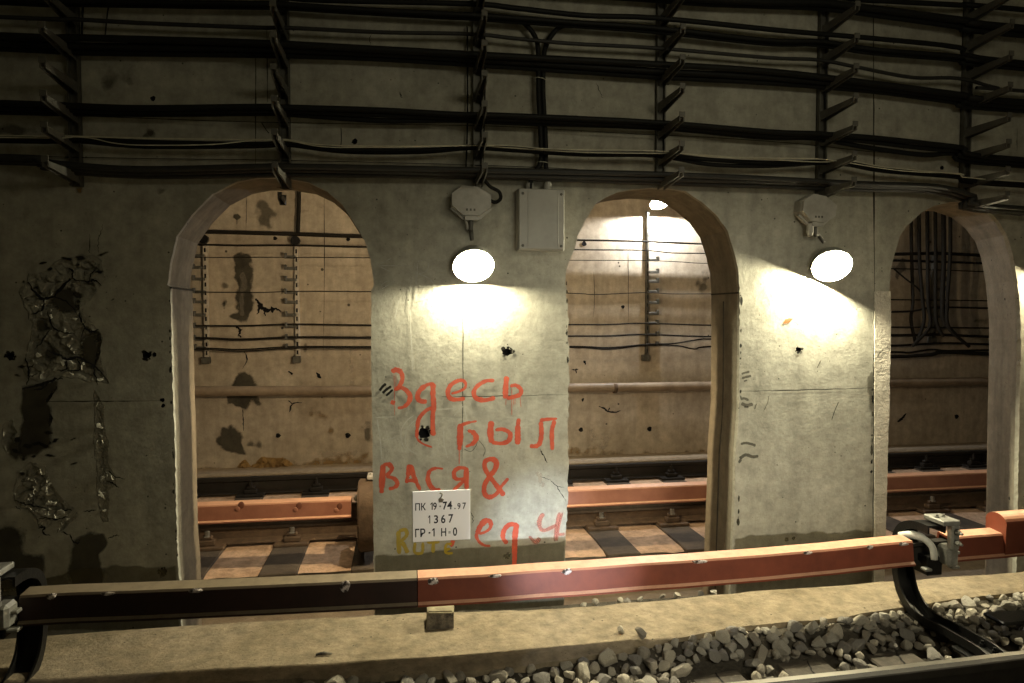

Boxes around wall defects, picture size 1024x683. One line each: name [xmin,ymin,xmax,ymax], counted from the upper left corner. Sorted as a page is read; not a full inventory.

damp [258,201,275,227]
damp [223,253,253,321]
crack [236,299,281,369]
spalling [12,252,117,528]
damp [227,372,261,409]
damp [216,425,261,454]